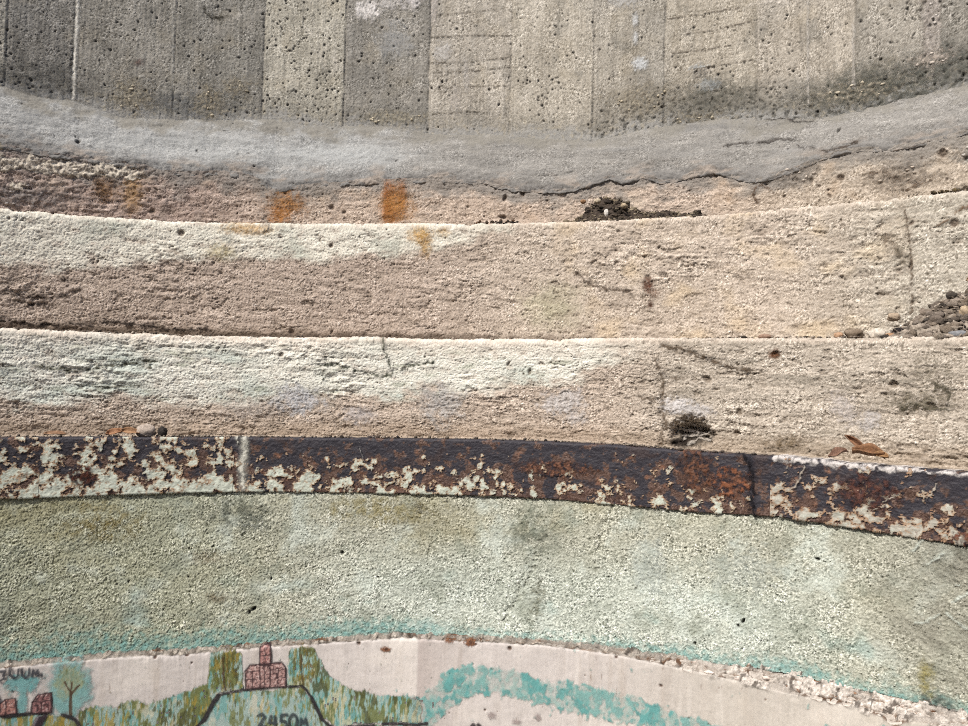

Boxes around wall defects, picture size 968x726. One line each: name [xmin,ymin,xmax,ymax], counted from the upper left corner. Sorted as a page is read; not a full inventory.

crack [0,276,208,332]
crack [0,356,156,389]
corrosion [69,465,95,485]
peeling [499,481,517,496]
peeling [554,469,584,495]
peeling [798,474,828,498]
corrosion [831,472,901,511]
peeling [941,504,956,516]
spalling [723,663,772,690]
spalling [779,670,872,715]
spalling [871,690,936,723]
spalling [954,708,968,726]